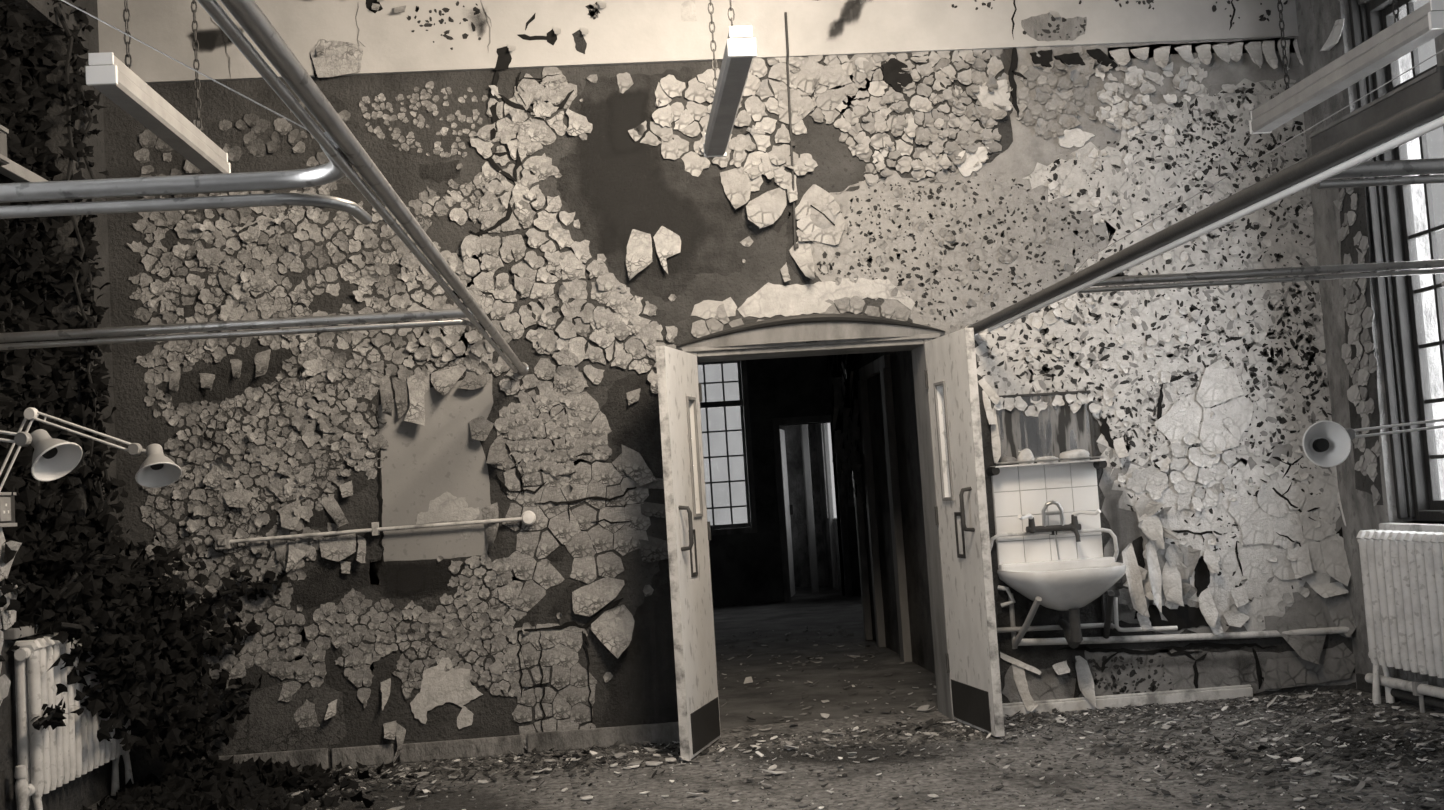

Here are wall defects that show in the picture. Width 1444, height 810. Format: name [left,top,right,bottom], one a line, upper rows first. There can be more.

peeling [366,0,481,50]
crack [470,0,574,263]
spalling [547,1,607,54]
peeling [127,10,1356,763]
peeling [1333,156,1383,506]
peeling [0,527,22,706]